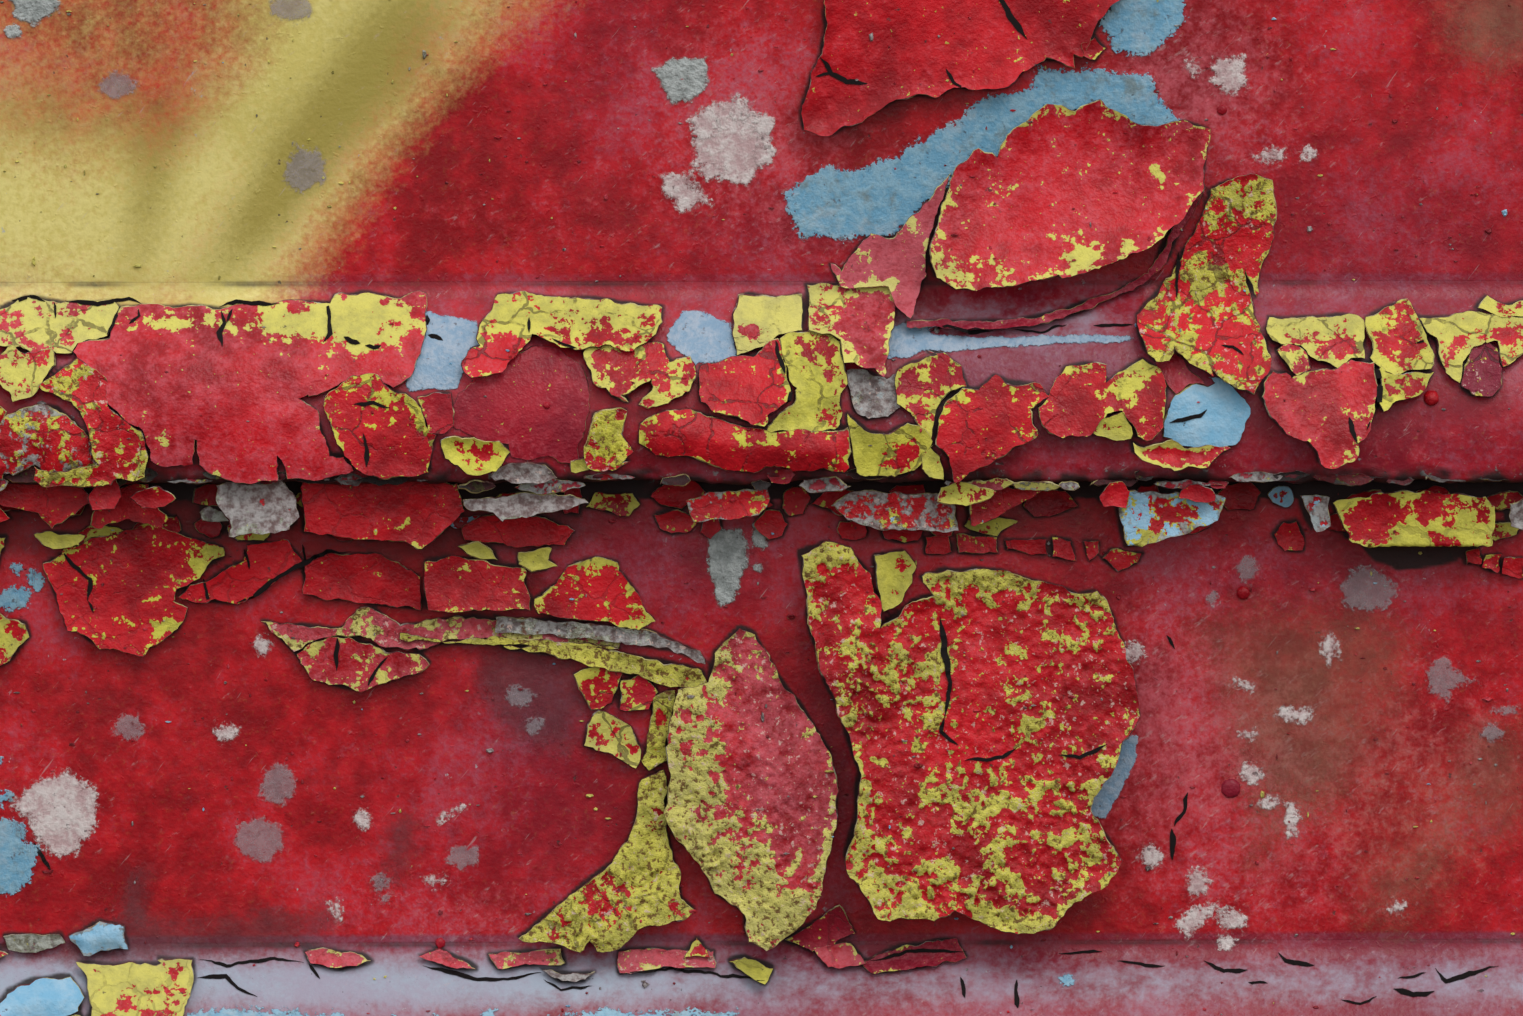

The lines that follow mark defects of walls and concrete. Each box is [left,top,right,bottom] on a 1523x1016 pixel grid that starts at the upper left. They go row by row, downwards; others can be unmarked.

peeling [0,0,1523,657]
peeling [0,613,30,665]
peeling [261,556,966,974]
peeling [801,541,1140,935]
peeling [0,789,41,896]
peeling [0,921,344,1016]
peeling [543,969,595,982]
peeling [547,1006,739,1016]
peeling [728,957,773,984]
peeling [1058,974,1074,986]